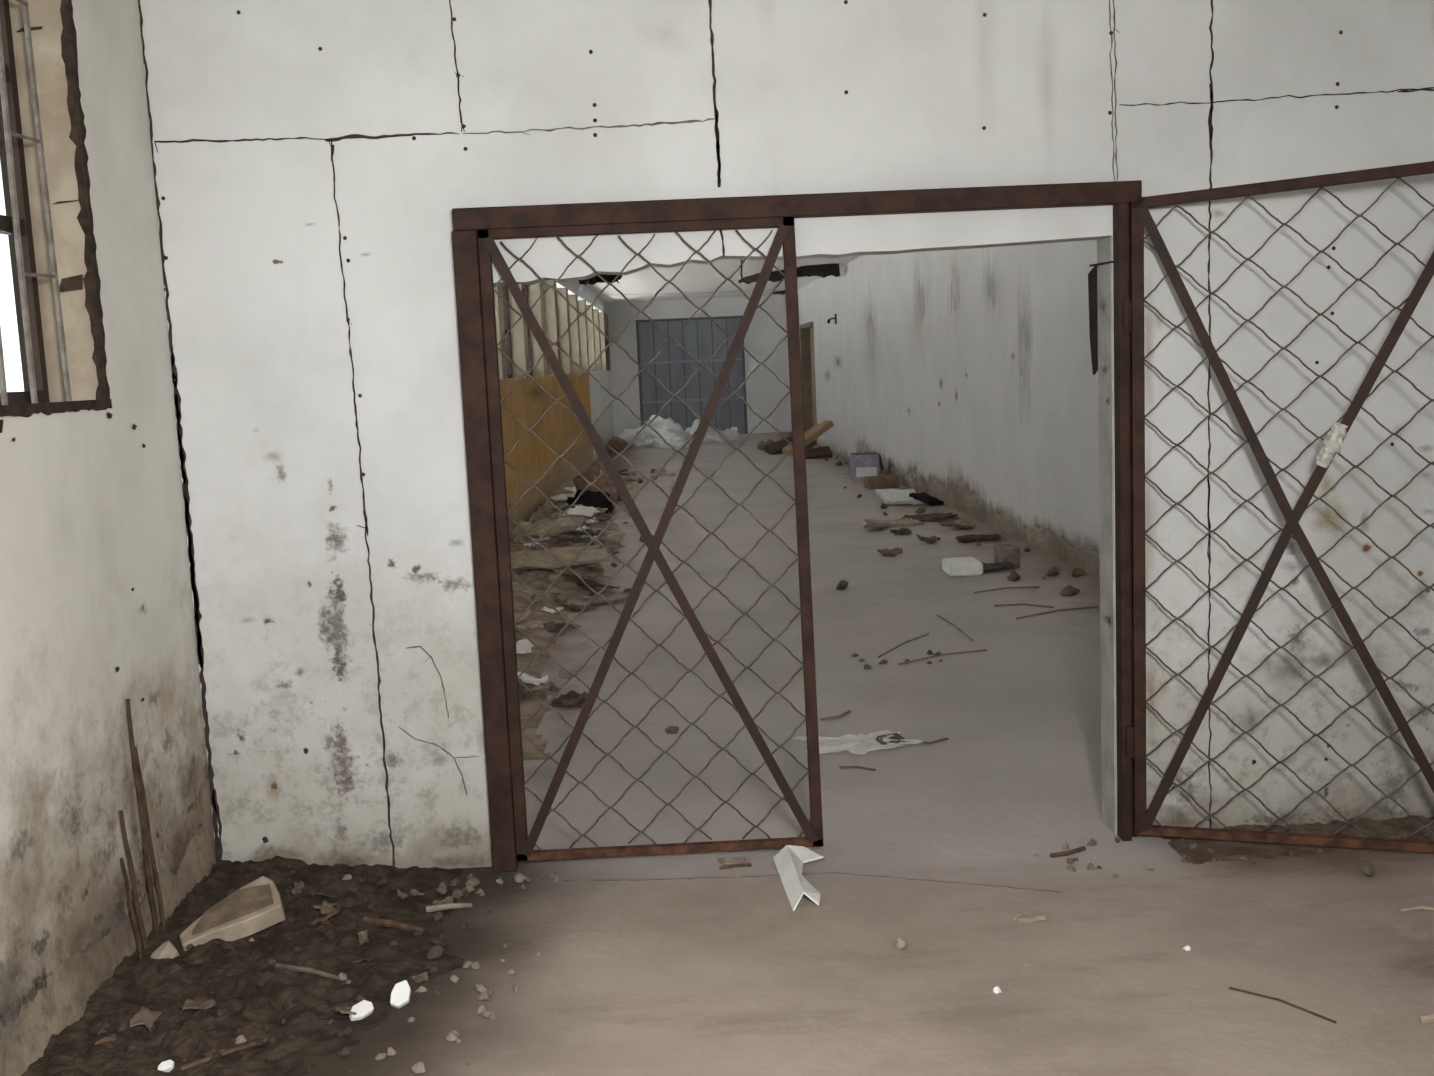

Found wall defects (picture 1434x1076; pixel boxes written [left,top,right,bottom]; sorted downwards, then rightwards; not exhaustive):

leakage [322,579,346,681]
leakage [327,734,351,790]
leakage [0,932,52,1036]